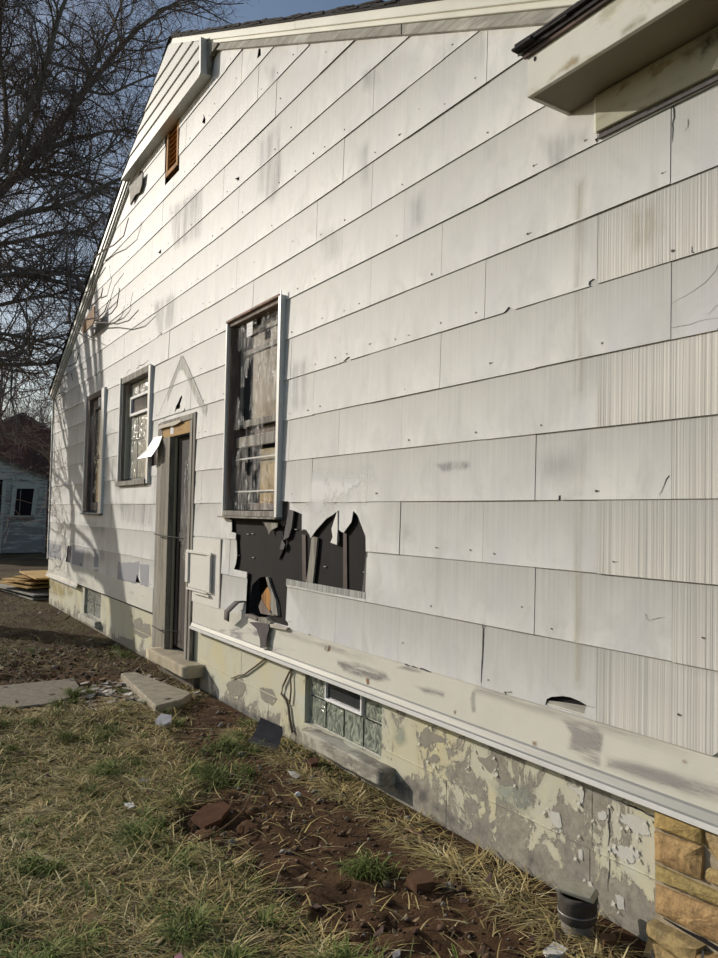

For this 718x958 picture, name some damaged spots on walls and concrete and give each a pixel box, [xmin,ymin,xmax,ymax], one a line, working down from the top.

spalling [260,576,268,601]
peeling [226,678,246,698]
peeling [258,686,276,705]
spalling [546,696,586,714]
peeling [418,724,450,768]
peeling [568,724,600,762]
peeling [465,750,516,787]
peeling [568,784,584,810]
peeling [540,807,563,833]
peeling [591,804,652,864]
peeling [611,894,625,914]